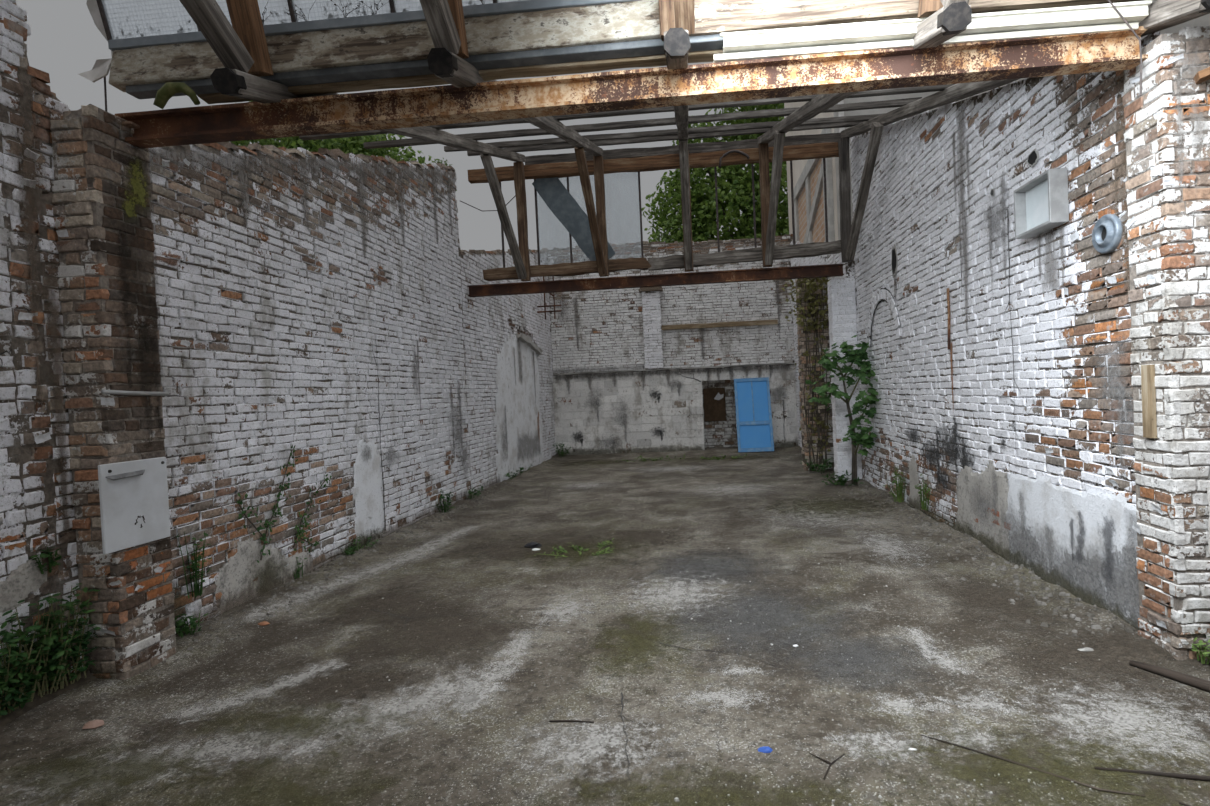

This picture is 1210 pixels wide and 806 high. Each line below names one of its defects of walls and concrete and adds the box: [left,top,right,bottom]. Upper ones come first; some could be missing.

peeling [918,115,945,147]
peeling [967,92,1041,137]
peeling [1166,52,1210,79]
peeling [0,75,115,628]
peeling [1001,75,1210,516]
spalling [101,447,357,627]
water stain [978,480,1139,613]
spalling [1132,521,1178,629]